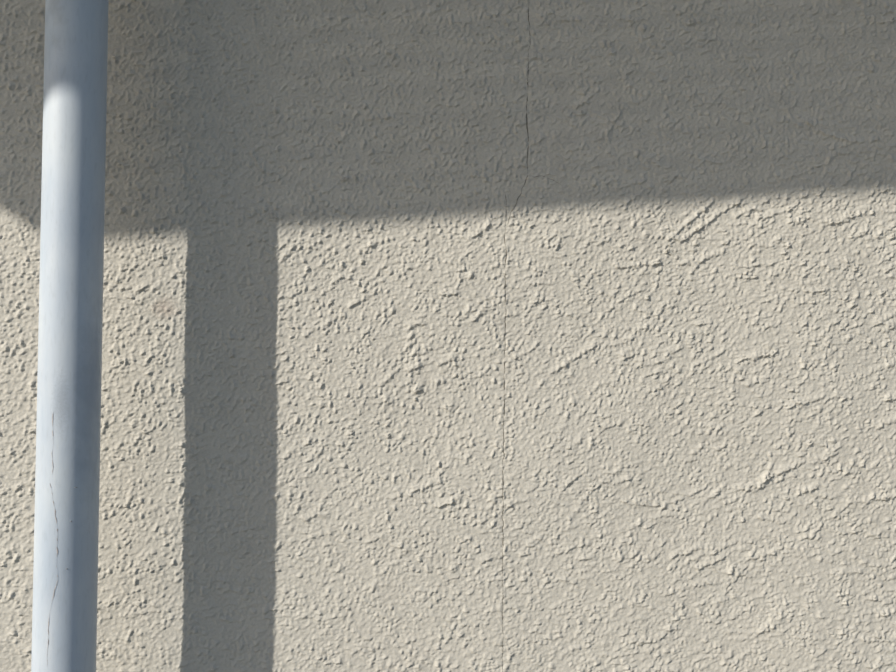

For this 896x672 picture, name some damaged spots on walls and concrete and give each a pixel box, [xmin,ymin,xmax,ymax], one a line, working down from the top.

crack [501,9,558,672]